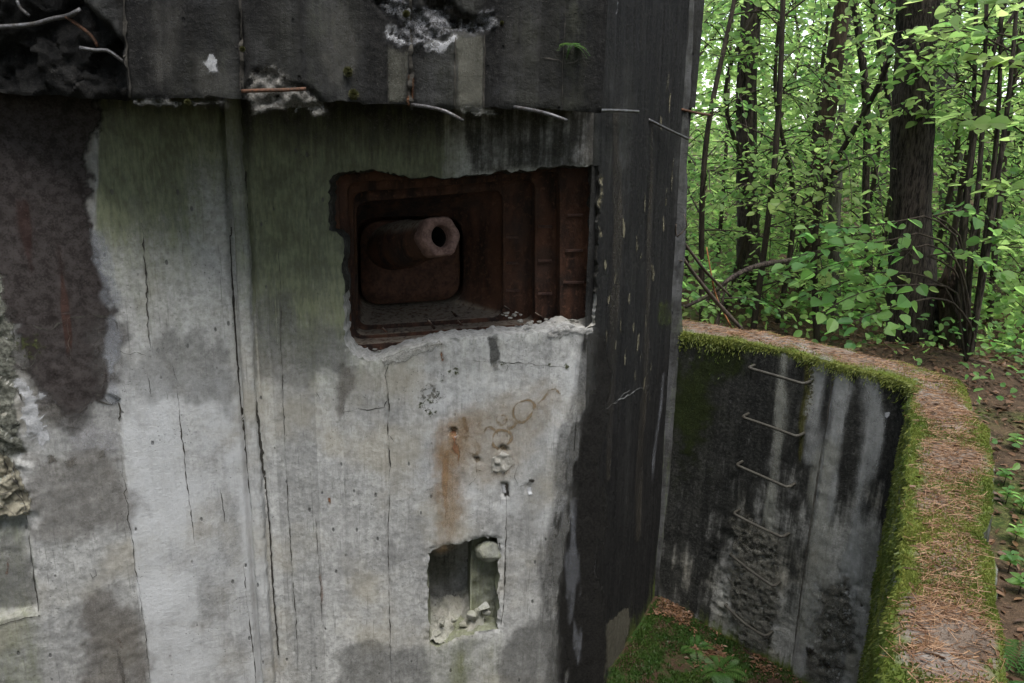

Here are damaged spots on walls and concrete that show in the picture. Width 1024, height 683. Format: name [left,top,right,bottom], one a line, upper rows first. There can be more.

spalling [248,66,325,115]
spalling [383,0,498,52]
spalling [0,278,31,517]
damp [0,92,127,512]
crack [10,226,195,544]
damp [81,592,147,683]
crack [230,227,298,678]
rust [438,417,468,512]
damp [761,355,786,563]
damp [800,361,850,640]
damp [828,379,890,683]